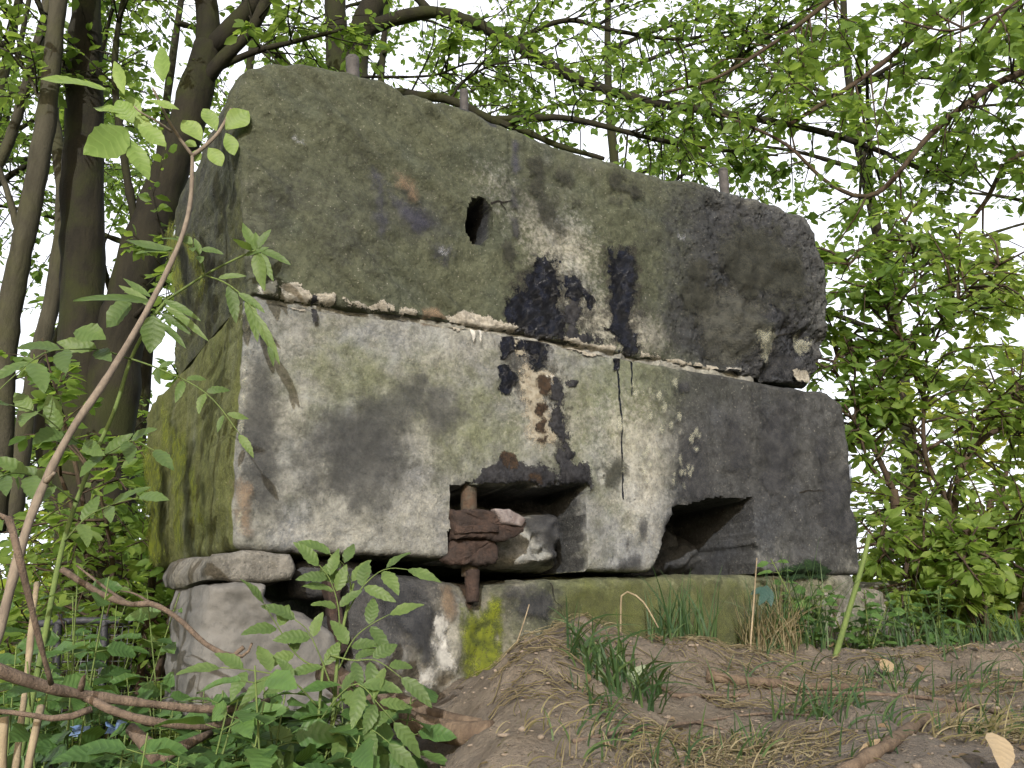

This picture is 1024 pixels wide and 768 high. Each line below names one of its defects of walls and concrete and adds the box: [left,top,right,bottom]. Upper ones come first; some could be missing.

peeling [564,275,596,311]
spalling [258,281,557,446]
water stain [497,244,644,464]
spalling [564,336,617,357]
spalling [640,351,742,372]
spalling [471,450,628,491]
rust [457,584,474,612]